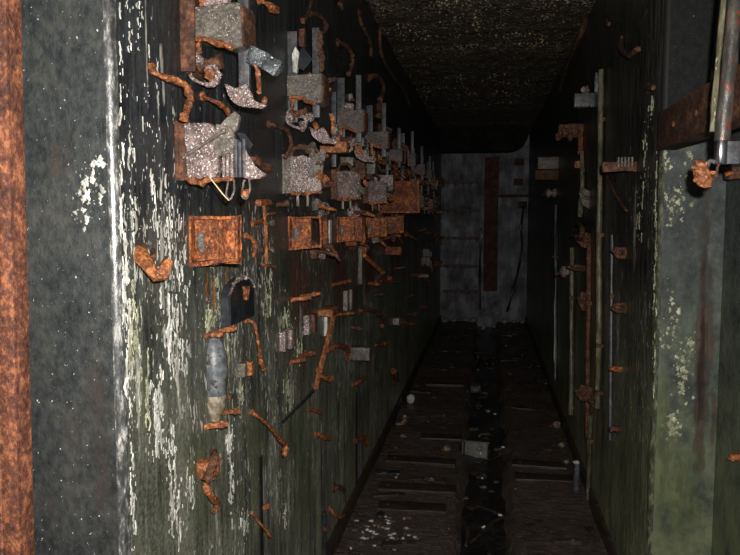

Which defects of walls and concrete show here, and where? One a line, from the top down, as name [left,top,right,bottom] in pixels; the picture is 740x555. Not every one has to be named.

peeling [119,0,159,75]
peeling [115,84,195,552]
peeling [201,275,220,333]
peeling [226,415,238,504]